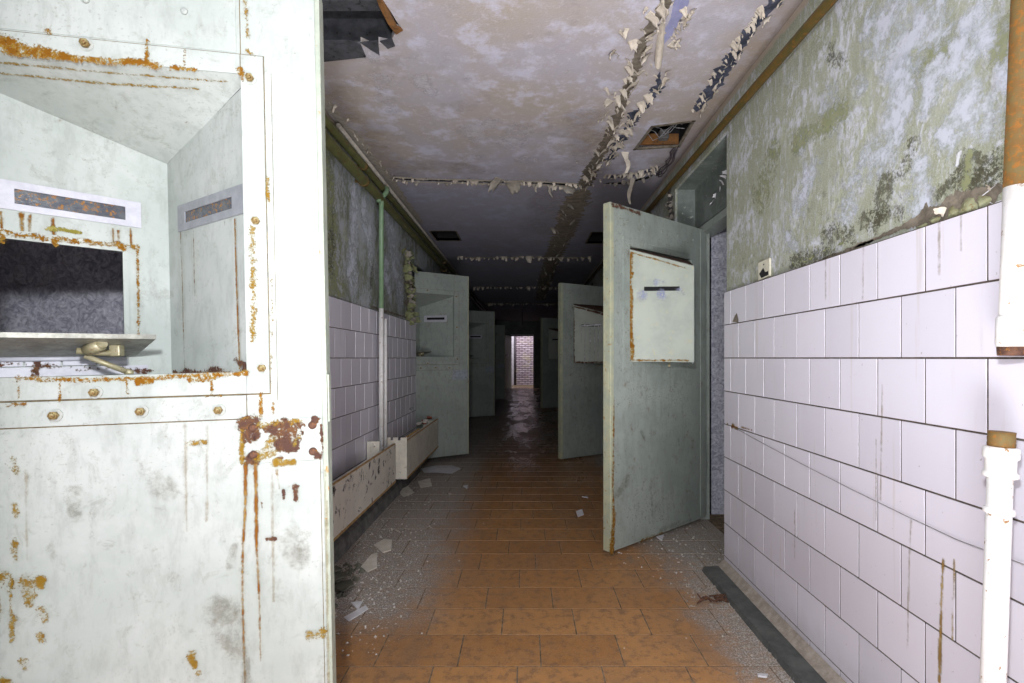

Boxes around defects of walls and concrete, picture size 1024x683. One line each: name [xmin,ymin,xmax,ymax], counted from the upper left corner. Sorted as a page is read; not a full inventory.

corrosion [0,28,225,90]
corrosion [0,211,273,407]
water stain [328,178,404,310]
peeling [322,0,697,307]
peeling [691,0,784,118]
peeling [794,131,816,217]
water stain [789,136,918,270]
flaking render [785,156,1003,269]
peeling [841,0,1009,221]
water stain [934,147,1003,200]
corrosion [236,354,324,679]
corrosion [0,571,48,643]